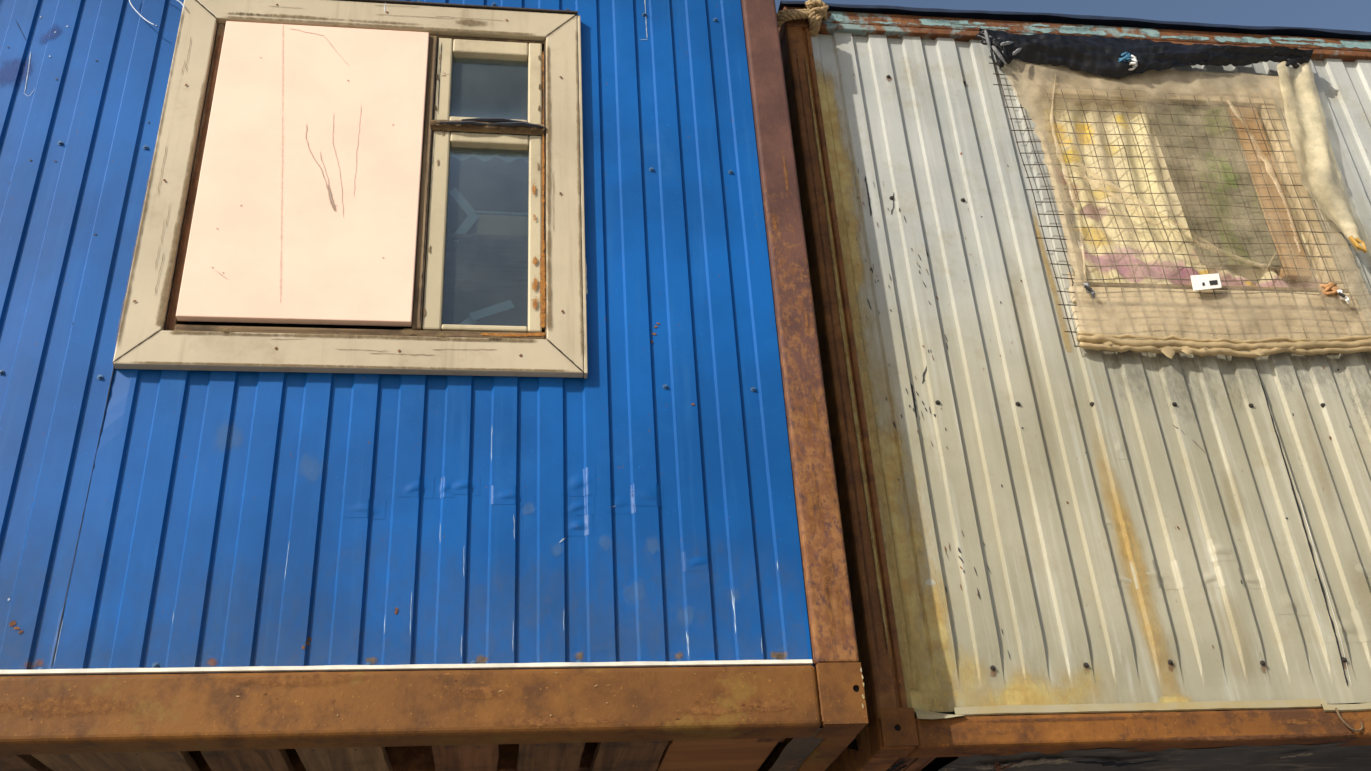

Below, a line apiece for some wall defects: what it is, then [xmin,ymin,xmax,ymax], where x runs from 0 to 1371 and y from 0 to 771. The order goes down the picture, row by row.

corrosion [481,52,546,337]
corrosion [796,58,1125,734]
crack [1253,358,1352,686]